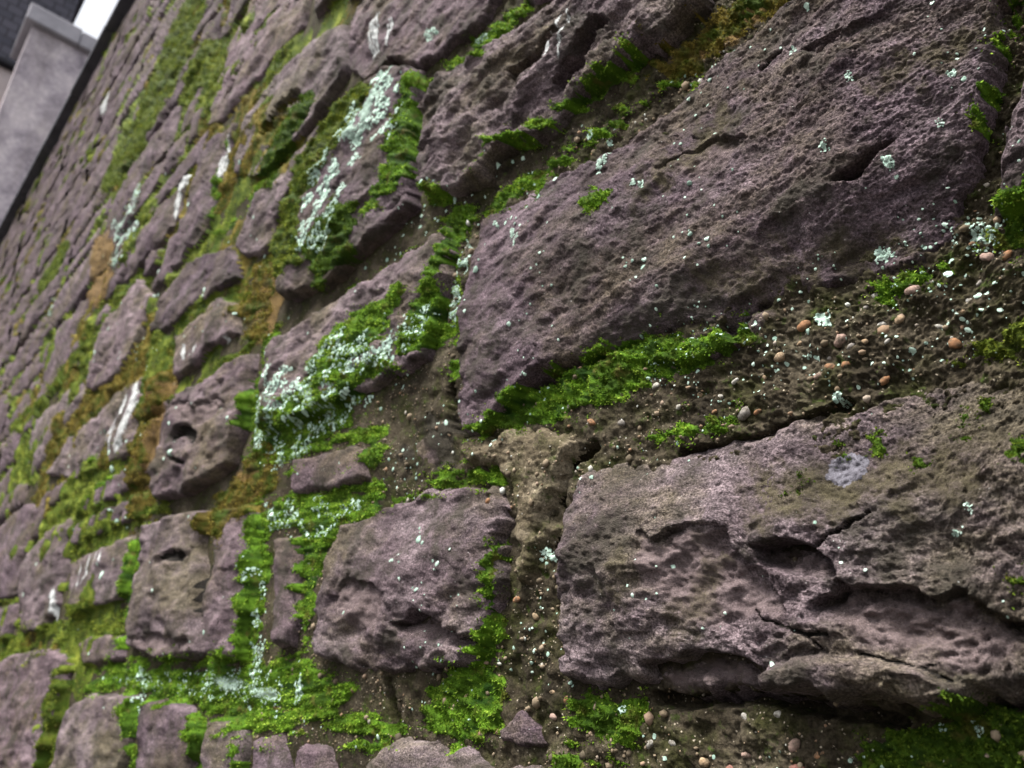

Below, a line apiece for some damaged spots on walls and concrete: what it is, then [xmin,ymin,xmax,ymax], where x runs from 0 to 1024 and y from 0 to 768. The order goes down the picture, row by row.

crack [816,511,871,558]
crack [755,609,829,649]
crack [860,653,953,683]